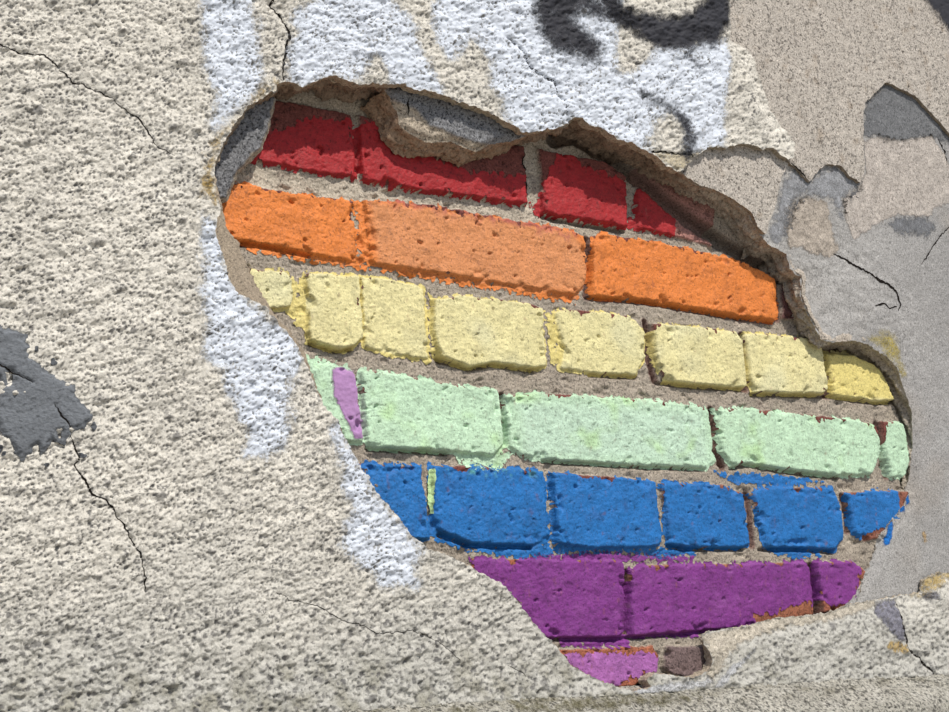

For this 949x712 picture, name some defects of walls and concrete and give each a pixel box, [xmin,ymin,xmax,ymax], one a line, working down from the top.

crack [269,0,292,80]
crack [0,44,171,154]
peeling [214,0,949,608]
crack [833,253,901,311]
crack [55,405,147,590]